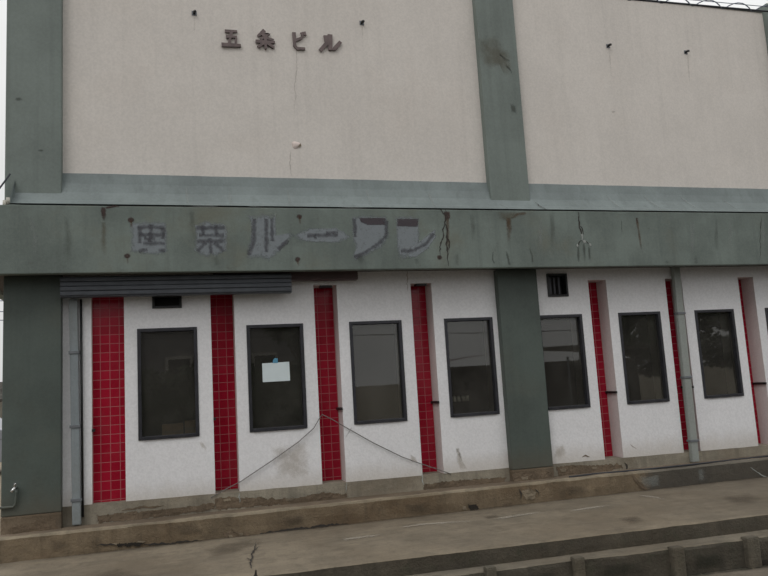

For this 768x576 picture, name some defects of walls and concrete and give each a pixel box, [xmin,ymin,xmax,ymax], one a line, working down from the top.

crack [437,209,450,266]
crack [577,212,592,247]
spalling [97,492,347,524]